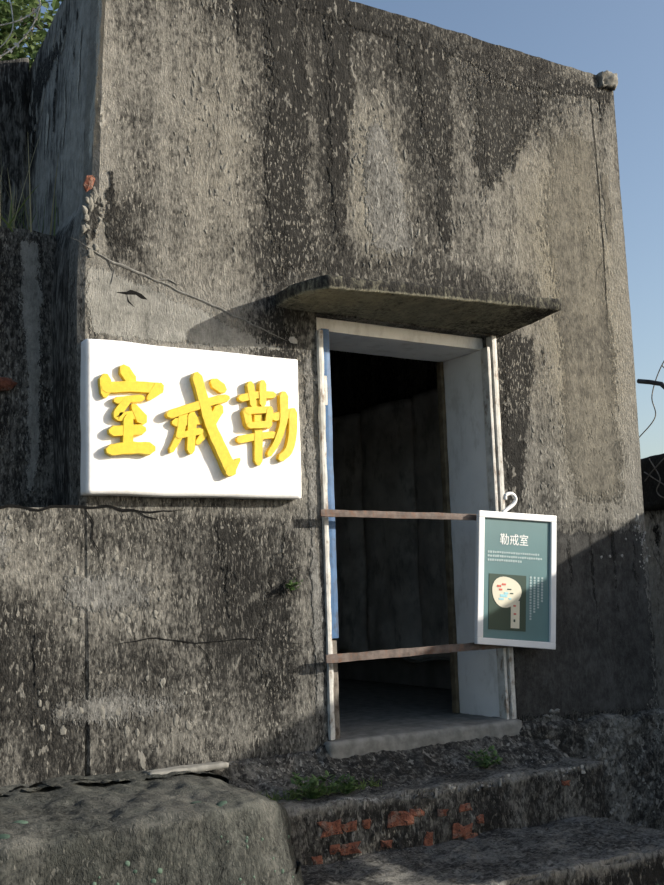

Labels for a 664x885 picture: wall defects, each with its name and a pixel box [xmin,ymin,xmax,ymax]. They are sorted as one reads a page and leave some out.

water stain [262,0,612,295]
water stain [103,168,120,249]
crack [0,504,178,554]
water stain [513,524,662,718]
crack [115,625,262,668]
spalling [311,818,373,865]
spalling [387,807,425,828]
spalling [437,803,484,840]